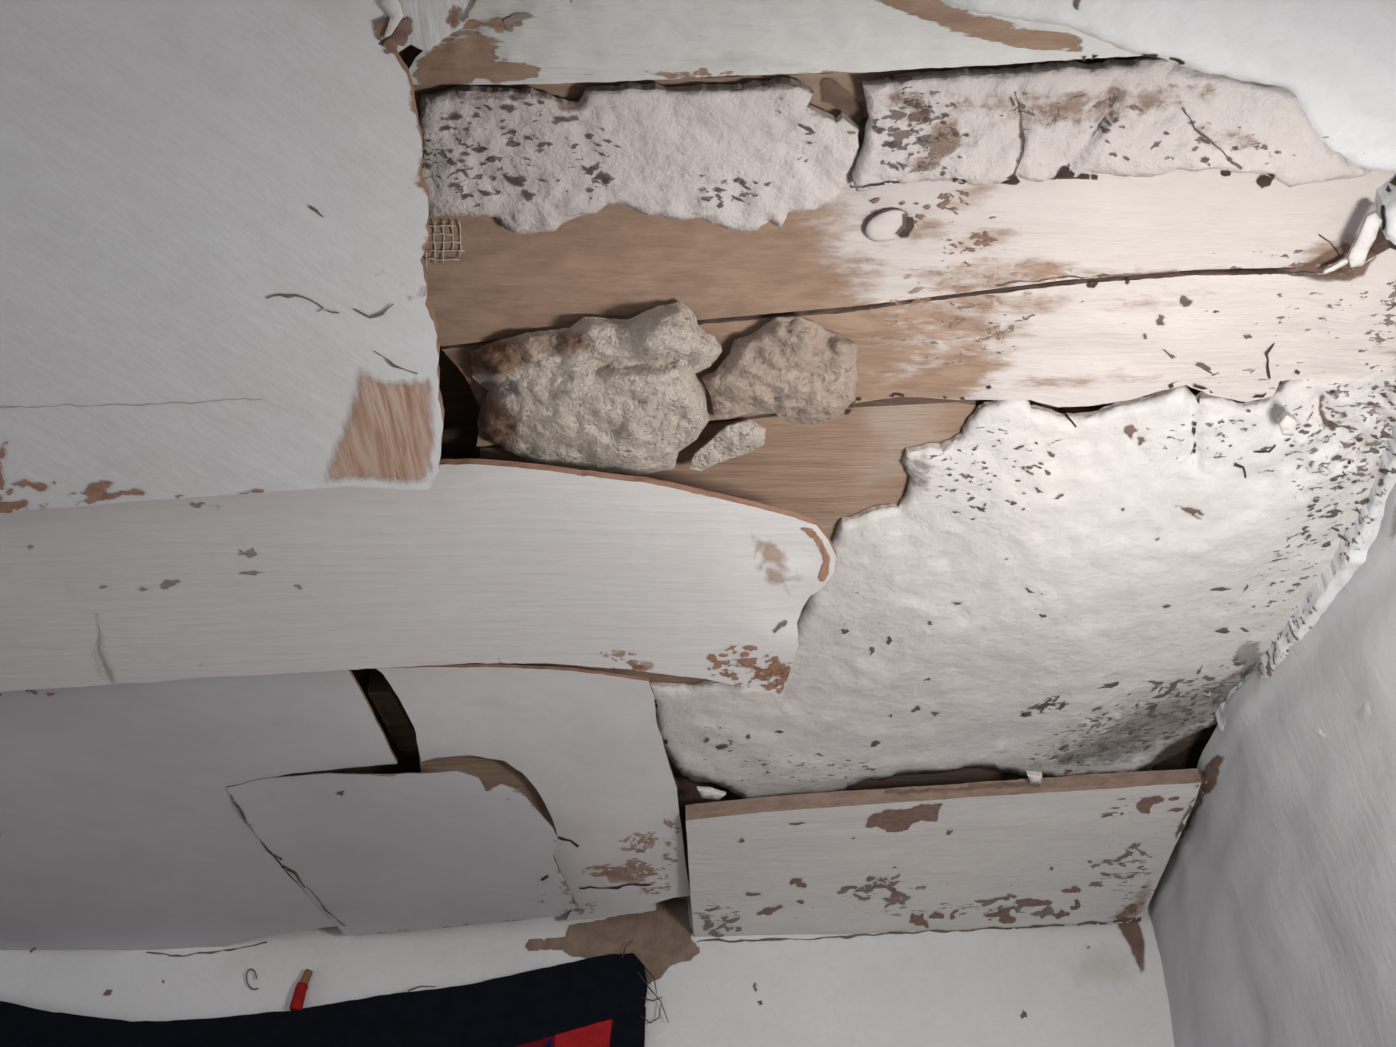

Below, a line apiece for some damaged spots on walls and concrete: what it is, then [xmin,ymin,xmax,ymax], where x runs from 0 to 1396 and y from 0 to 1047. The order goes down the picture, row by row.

spalling [423,97,553,202]
spalling [1054,167,1098,180]
spalling [1257,174,1275,188]
peeling [1322,210,1382,275]
peeling [329,374,433,481]
spalling [1260,381,1396,547]
spalling [1152,736,1211,771]
peeling [697,786,726,800]
peeling [852,770,1042,839]
crack [233,801,345,926]
peeling [837,867,958,928]
peeling [975,843,1152,924]